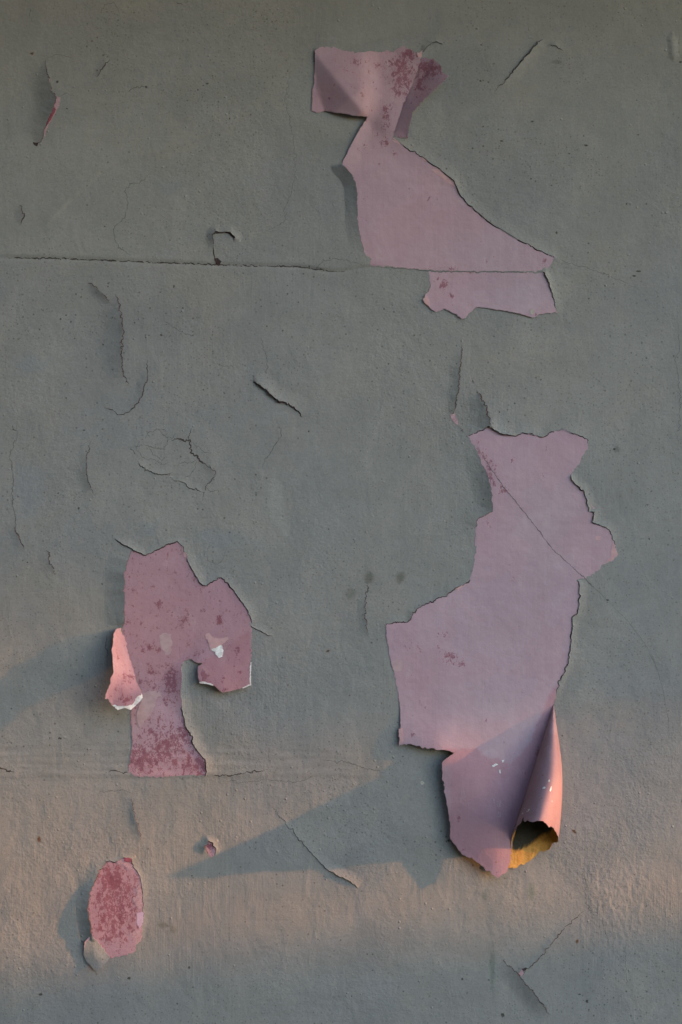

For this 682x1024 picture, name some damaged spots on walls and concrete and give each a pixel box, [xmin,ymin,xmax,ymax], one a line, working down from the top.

crack [15,174,368,415]
peeling [205,224,242,266]
peeling [312,34,565,320]
crack [130,428,217,501]
crack [230,341,313,462]
peeling [101,531,276,784]
peeling [379,416,665,878]
crack [223,759,385,889]
peeling [76,849,151,971]
crack [490,868,628,1024]